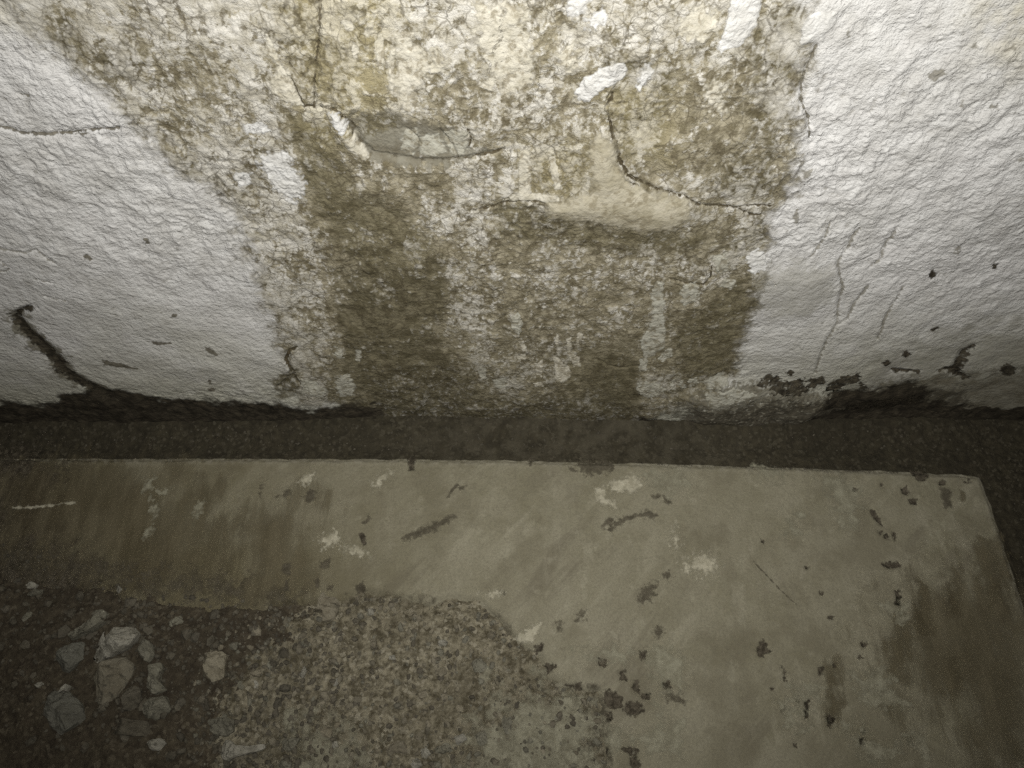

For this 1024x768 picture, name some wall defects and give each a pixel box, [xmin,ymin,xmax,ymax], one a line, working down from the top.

crack [291,0,505,161]
spalling [929,69,945,81]
crack [0,125,120,136]
crack [606,92,771,215]
water stain [0,0,1024,427]
crack [4,305,122,404]
spalling [999,363,1018,376]